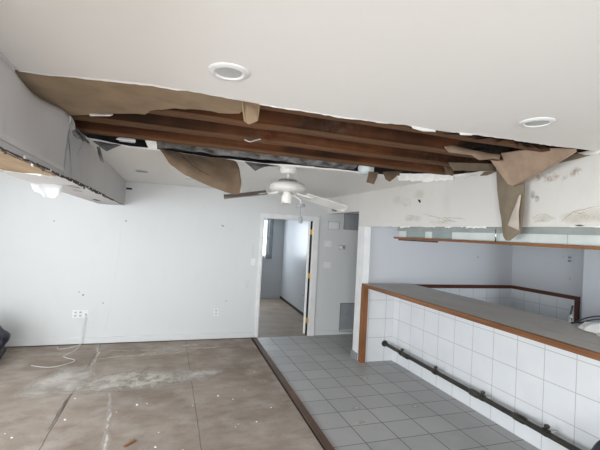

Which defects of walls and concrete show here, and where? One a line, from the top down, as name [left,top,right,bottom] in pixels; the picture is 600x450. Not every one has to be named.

peeling [15,70,392,124]